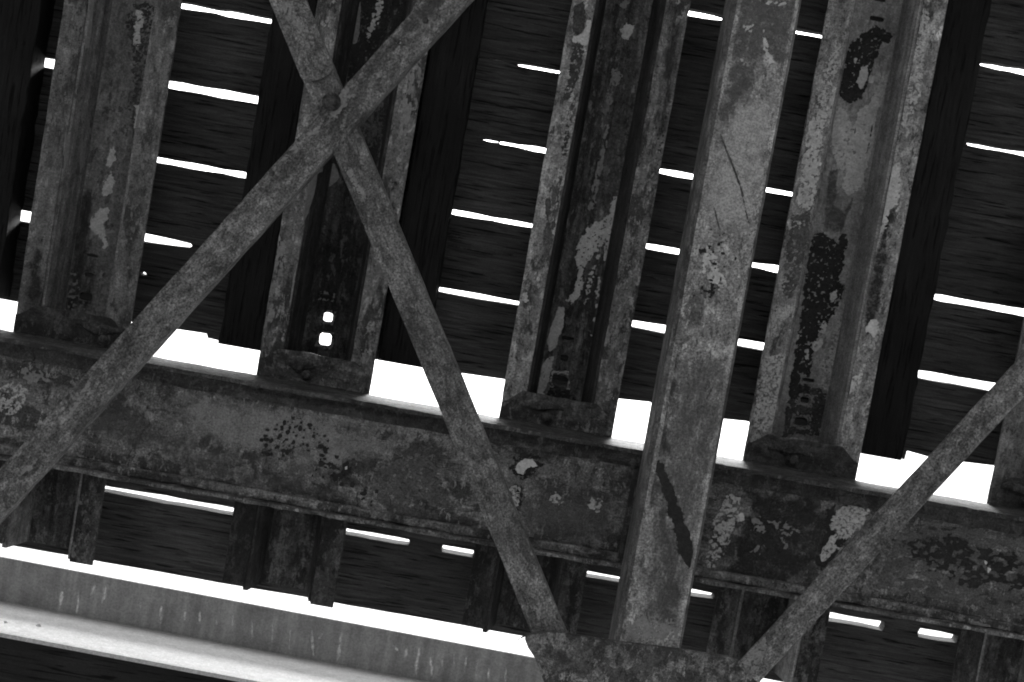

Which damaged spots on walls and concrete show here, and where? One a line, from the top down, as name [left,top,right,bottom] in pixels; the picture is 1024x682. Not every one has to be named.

peeling [796,40,880,211]
peeling [89,147,116,249]
peeling [537,124,617,394]
peeling [805,318,842,392]
peeling [509,459,538,507]
rust [509,453,544,511]
rust [650,362,693,622]
peeling [704,494,800,568]
rust [726,492,848,581]
peeling [819,505,870,562]
rust [907,533,1024,591]